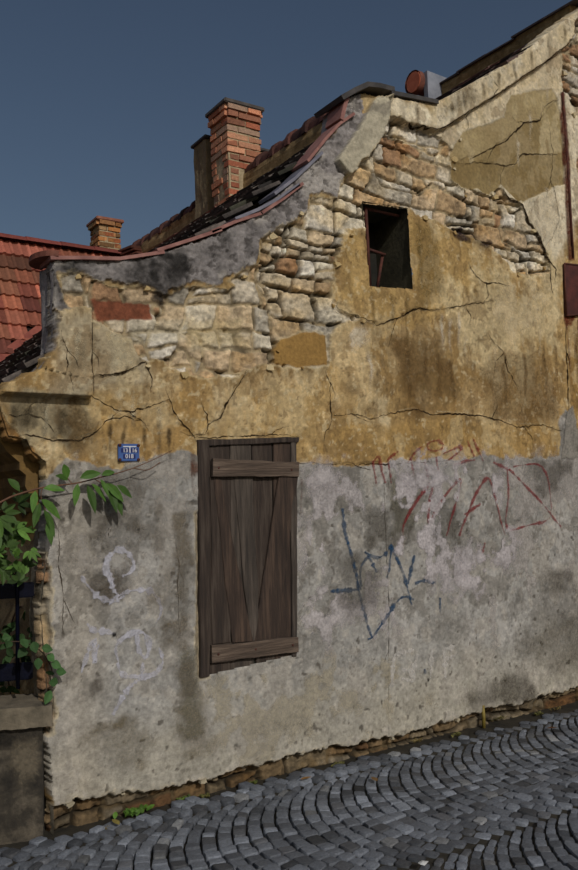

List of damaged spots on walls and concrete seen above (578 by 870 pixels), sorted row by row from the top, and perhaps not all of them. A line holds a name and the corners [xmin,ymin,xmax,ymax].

flaking render [61,18,578,379]
crack [462,100,560,292]
crack [331,263,506,344]
crack [9,307,297,442]
crack [324,364,561,440]
crack [300,460,450,500]
crack [58,527,76,630]
flaking render [44,687,578,831]